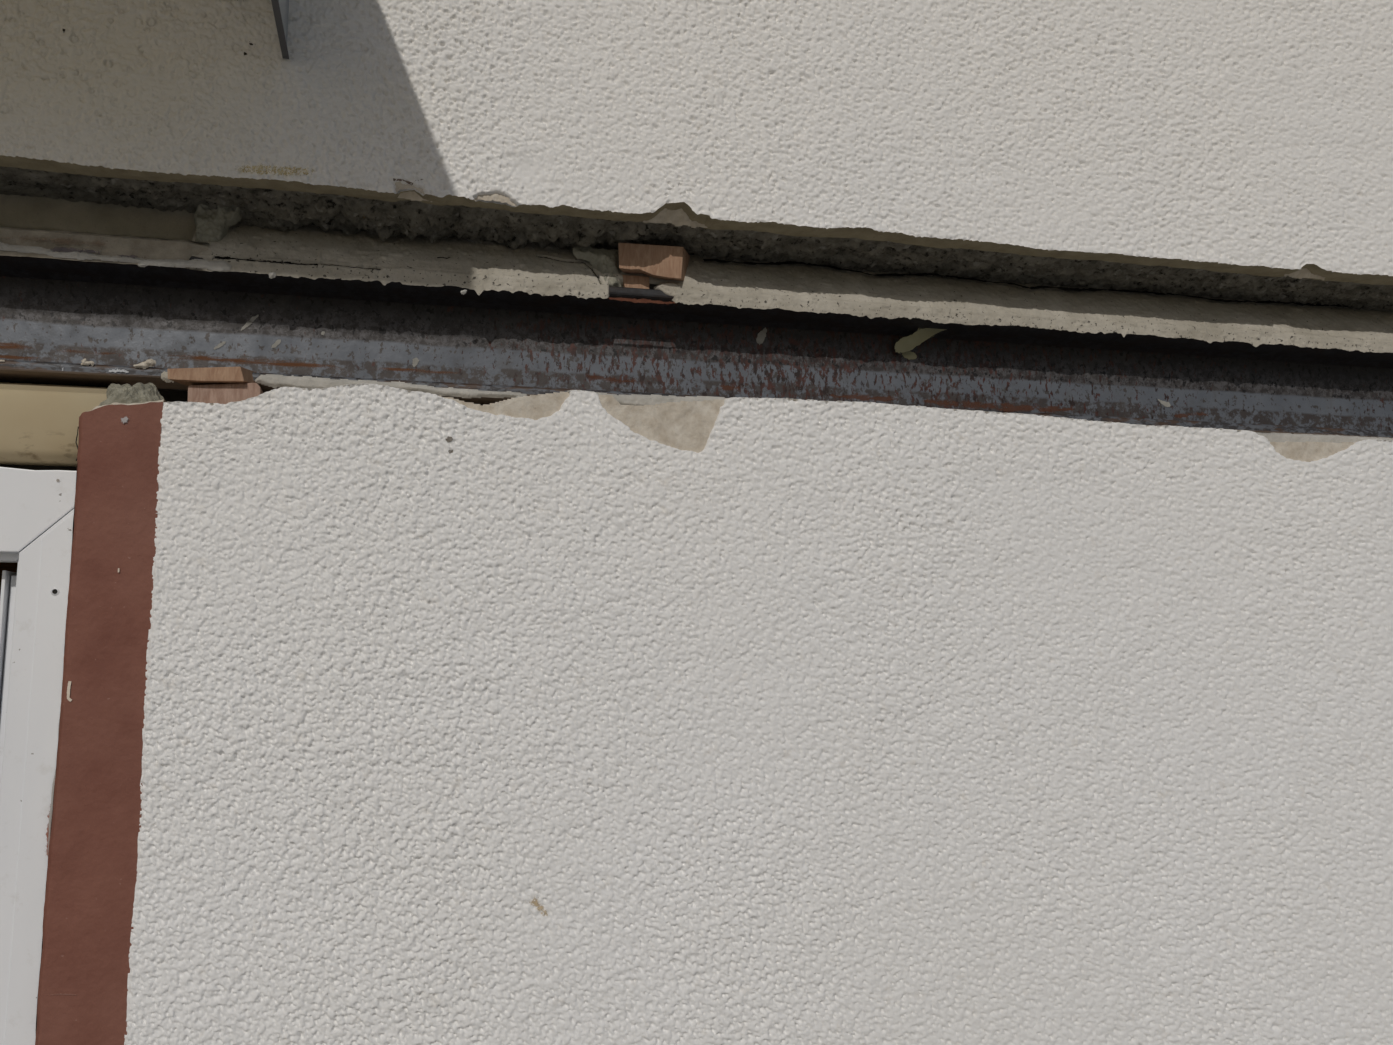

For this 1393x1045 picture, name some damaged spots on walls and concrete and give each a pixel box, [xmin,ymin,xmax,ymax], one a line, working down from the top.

spalling [474,193,516,206]
corrosion [0,343,36,359]
corrosion [172,355,326,367]
spalling [440,391,569,420]
corrosion [830,393,897,402]
corrosion [923,399,1073,413]
spalling [598,395,726,453]
spalling [1270,441,1357,462]